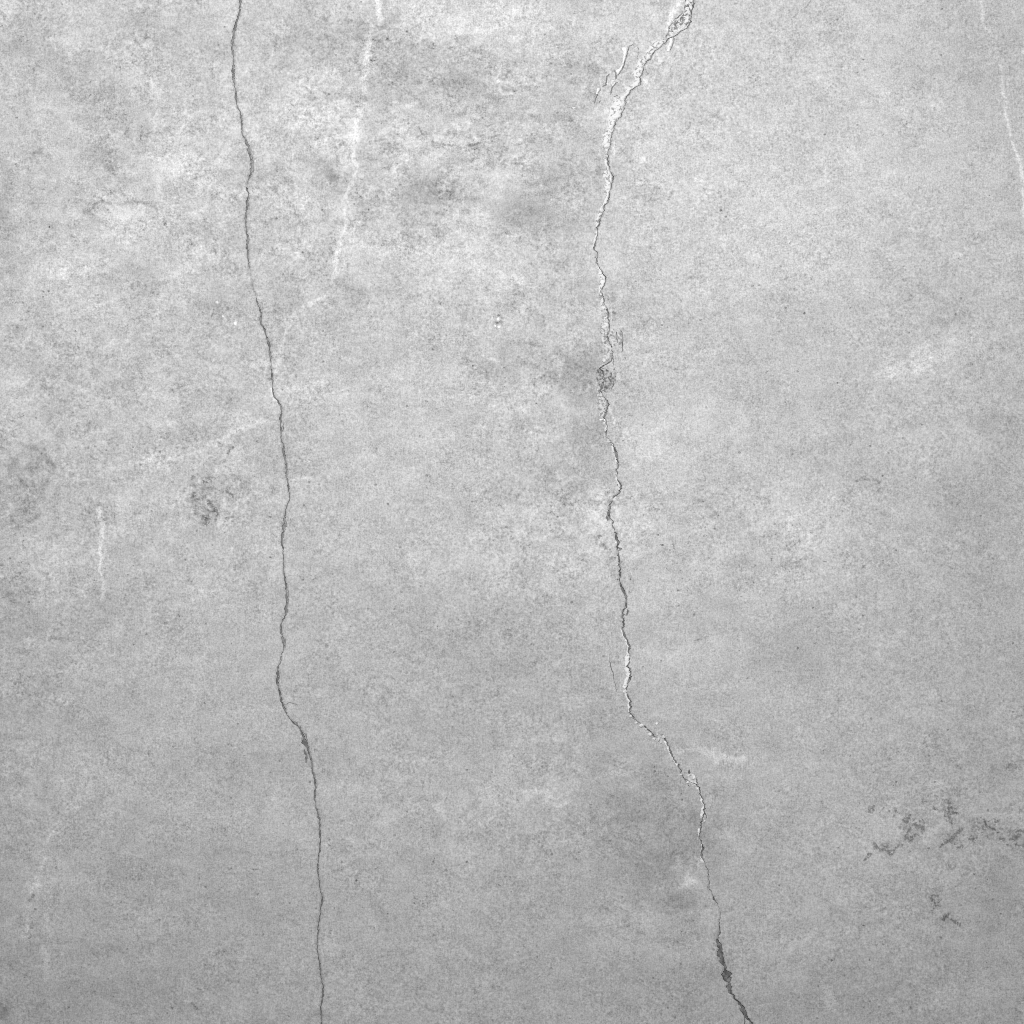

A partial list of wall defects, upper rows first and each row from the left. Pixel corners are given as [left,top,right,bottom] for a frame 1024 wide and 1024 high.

crack [231,0,324,1024]
crack [572,0,753,1024]